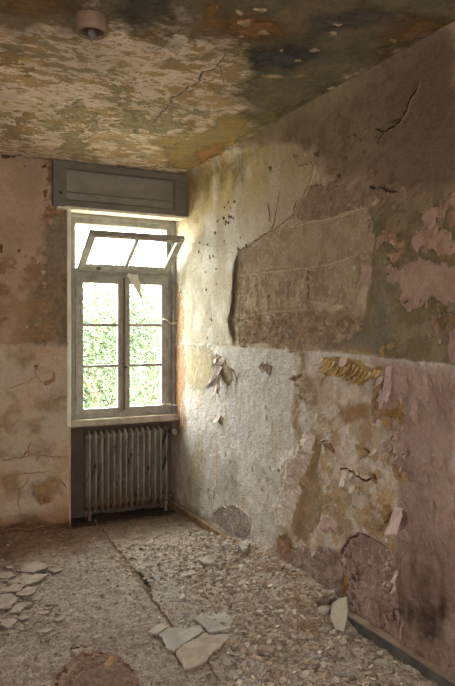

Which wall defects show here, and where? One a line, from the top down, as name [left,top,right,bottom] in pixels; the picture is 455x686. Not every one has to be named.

peeling [0,51,36,78]
peeling [0,80,223,159]
peeling [162,34,189,50]
crack [151,55,225,125]
water stain [0,0,455,171]
peeling [235,9,270,46]
crack [376,81,422,144]
spalling [184,167,455,641]
crack [0,440,67,522]
crack [94,518,173,627]